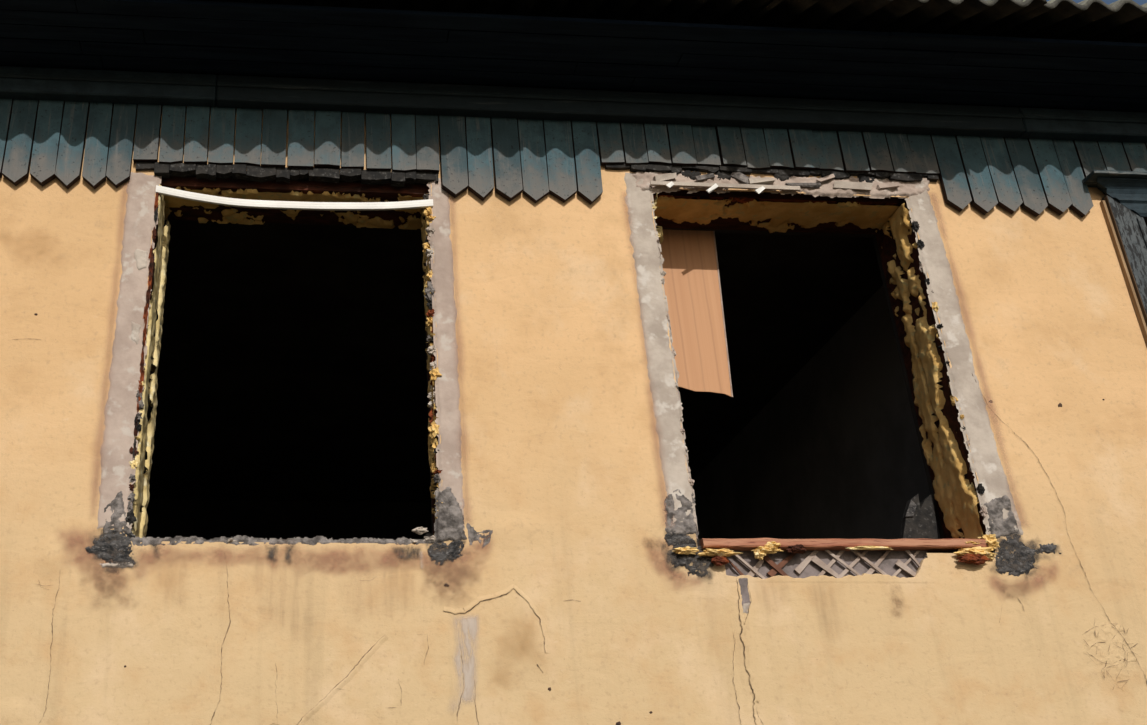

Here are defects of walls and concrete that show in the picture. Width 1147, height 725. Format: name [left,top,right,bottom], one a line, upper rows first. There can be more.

flaking render [97,172,162,529]
flaking render [624,170,1023,535]
crack [443,584,569,667]
crack [733,574,762,725]
crack [972,374,1147,691]